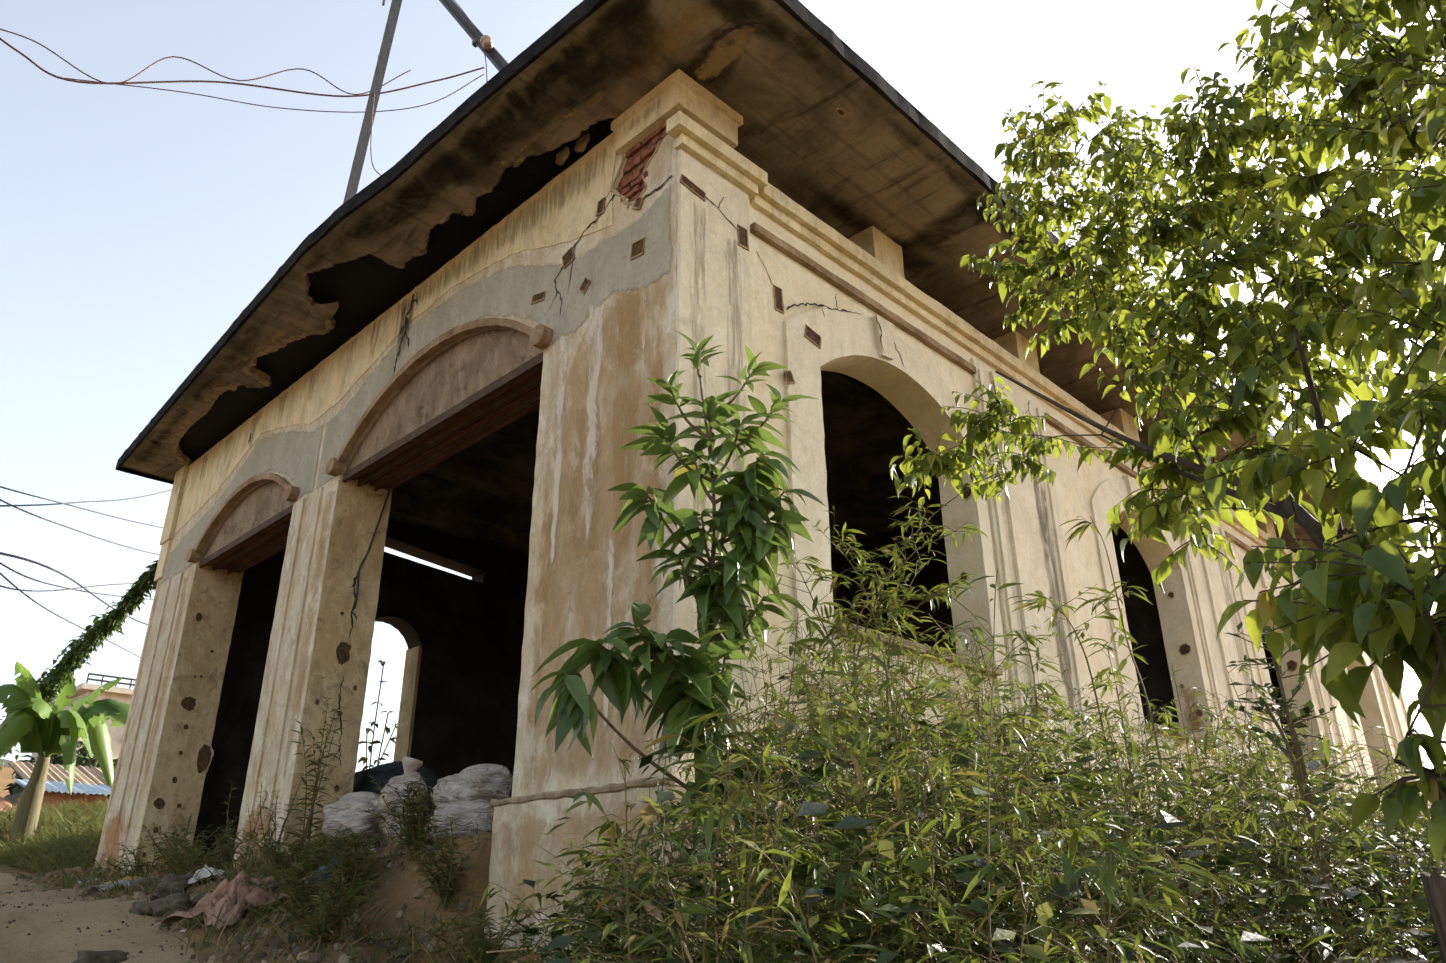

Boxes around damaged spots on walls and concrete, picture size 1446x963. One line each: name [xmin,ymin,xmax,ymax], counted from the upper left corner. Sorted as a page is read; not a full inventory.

leakage [711,0,785,40]
leakage [684,49,733,82]
leakage [354,0,650,238]
crack [549,175,672,317]
crack [706,197,904,366]
flaking render [158,113,706,585]
peeling [606,538,614,650]
spalling [333,640,354,668]
spalling [179,695,199,730]
spalling [178,740,214,776]
spalling [152,797,182,834]